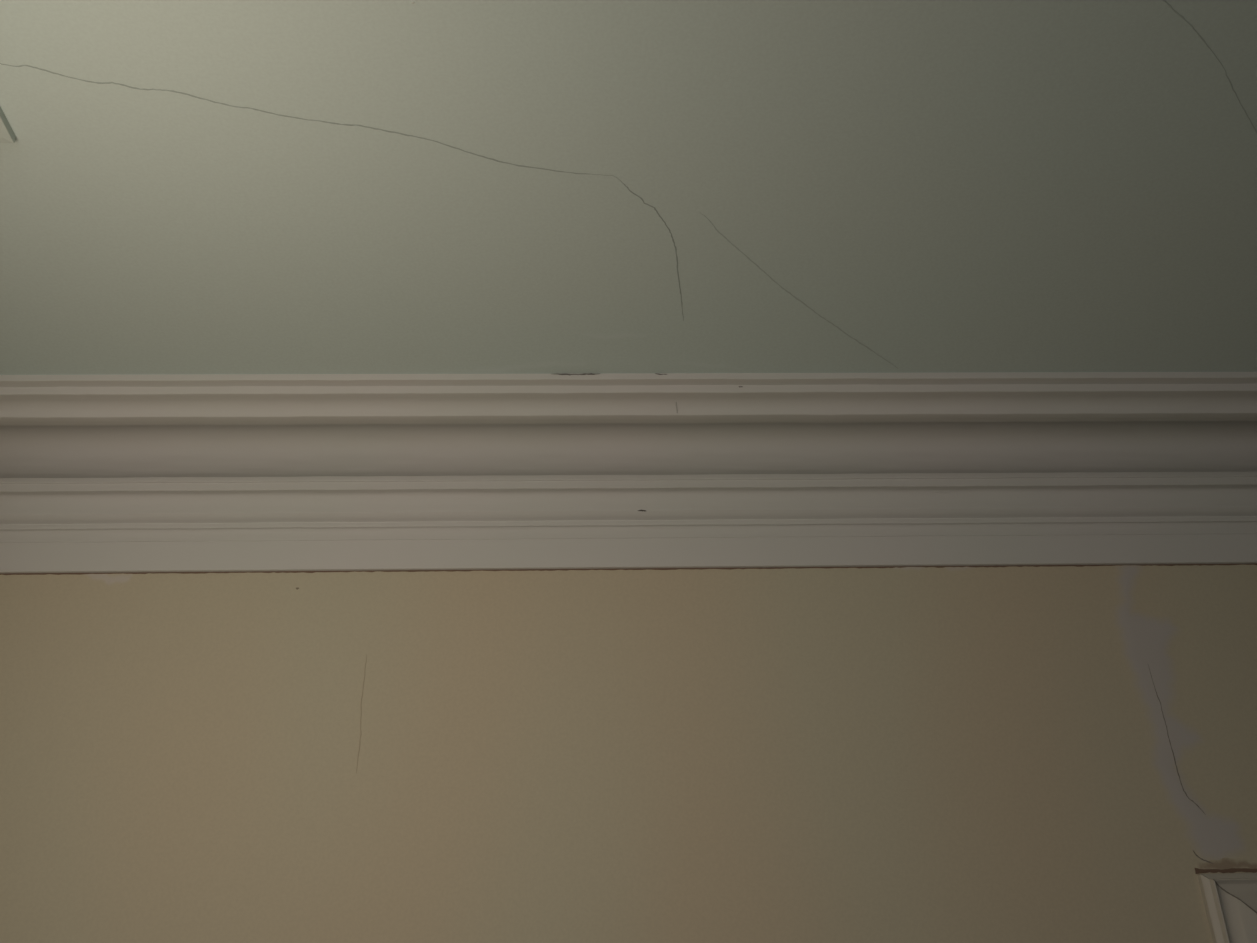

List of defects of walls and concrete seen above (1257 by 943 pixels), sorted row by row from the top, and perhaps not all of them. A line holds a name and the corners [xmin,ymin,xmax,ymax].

crack [0,63,684,321]
crack [1148,665,1206,815]
crack [1193,851,1257,914]